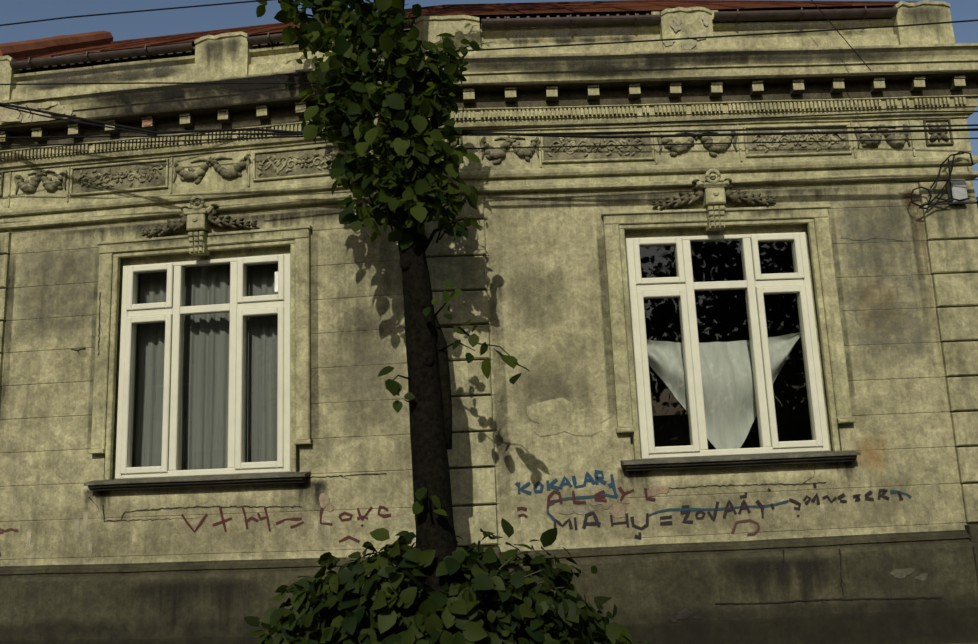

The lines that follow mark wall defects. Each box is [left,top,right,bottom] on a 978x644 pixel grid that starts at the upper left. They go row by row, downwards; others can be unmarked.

peeling [890,568,928,581]